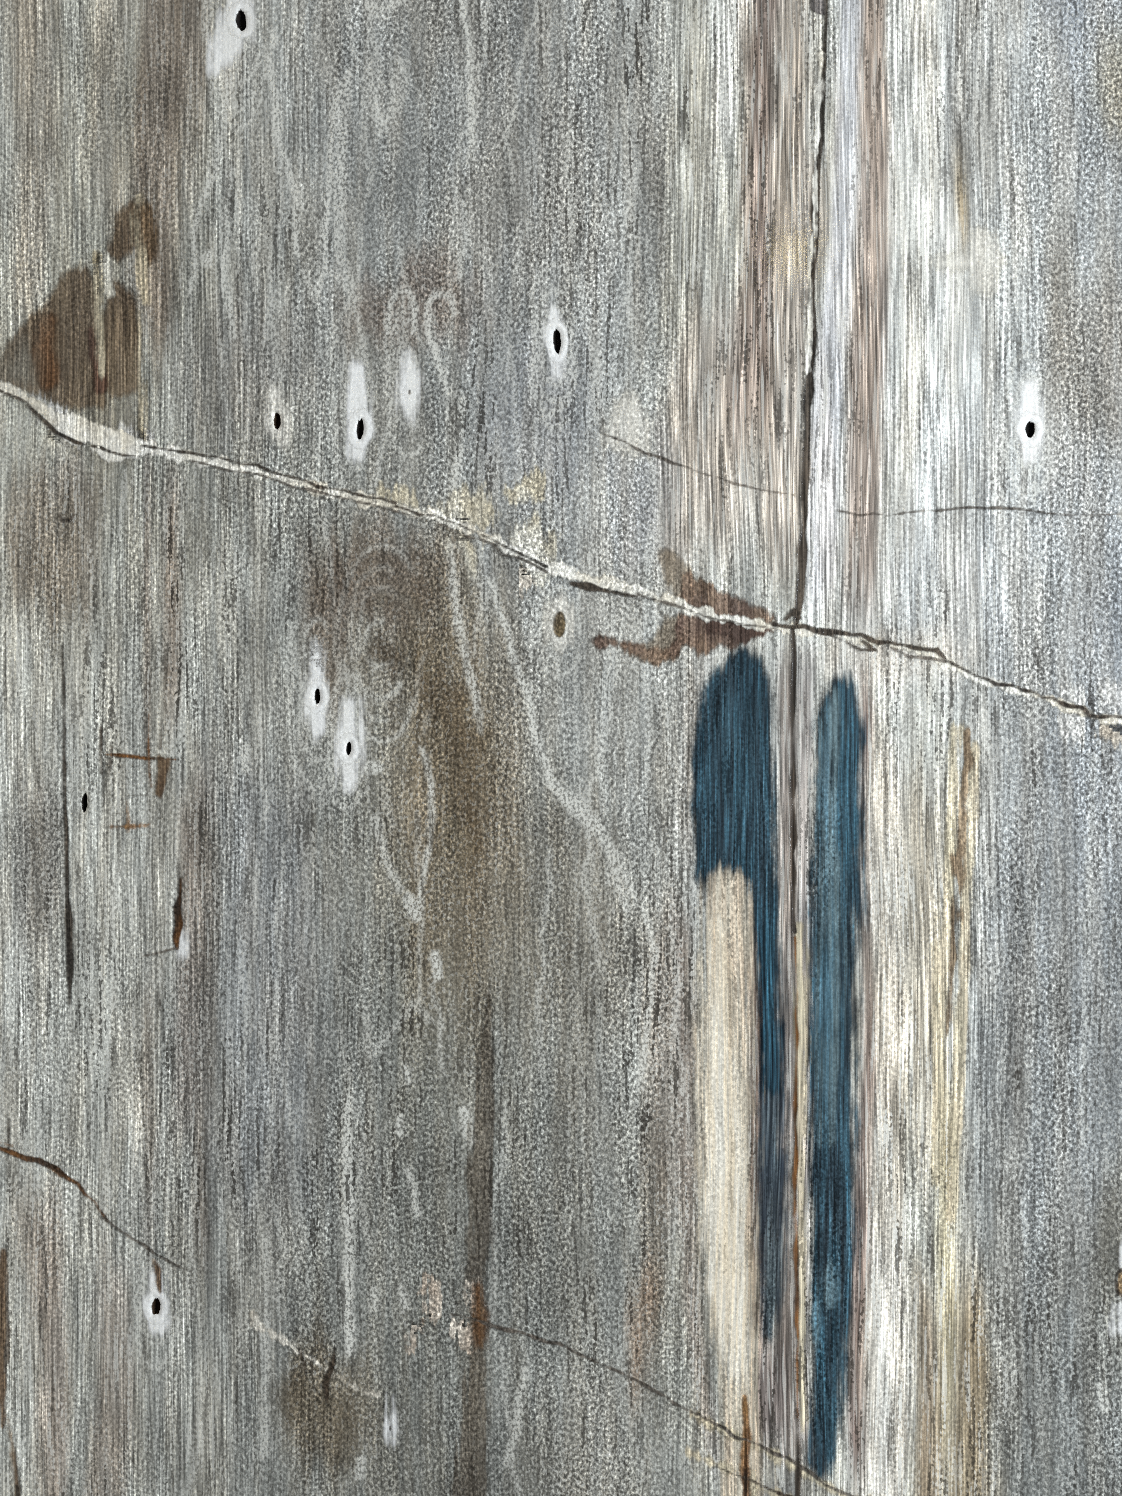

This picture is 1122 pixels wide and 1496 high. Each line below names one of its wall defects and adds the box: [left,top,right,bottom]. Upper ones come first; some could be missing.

leakage [0,194,158,442]
crack [0,0,1122,737]
crack [0,1120,192,1272]
crack [605,743,854,1496]
crack [0,1249,21,1496]
crack [250,1310,380,1403]
crack [467,1317,599,1363]